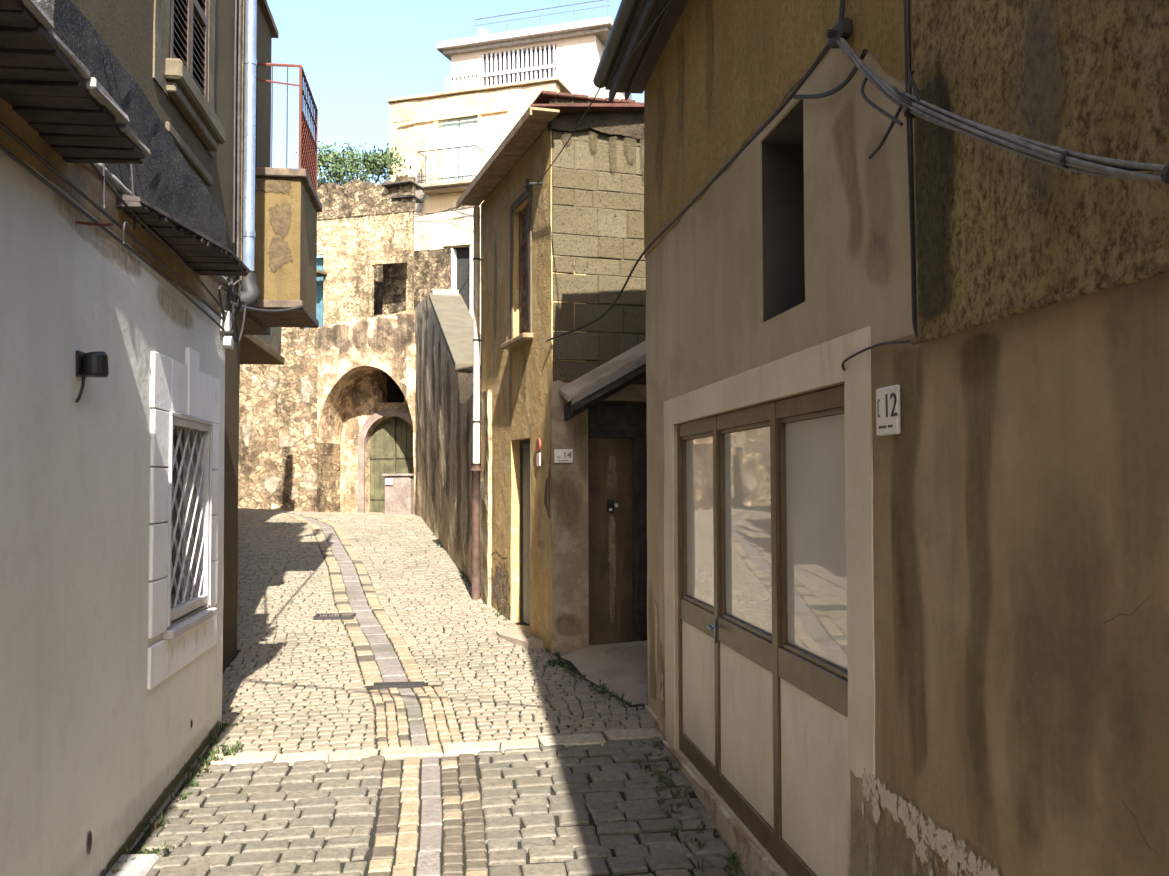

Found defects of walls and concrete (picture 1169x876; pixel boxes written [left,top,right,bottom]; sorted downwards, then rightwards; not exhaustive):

damp [919,74,951,112]
damp [913,116,954,320]
peeling [848,768,1000,876]